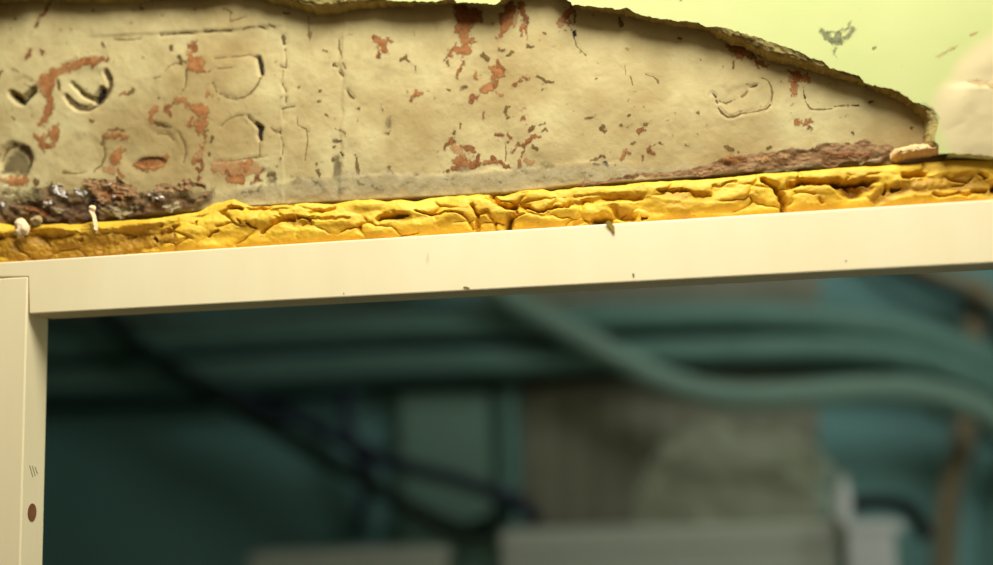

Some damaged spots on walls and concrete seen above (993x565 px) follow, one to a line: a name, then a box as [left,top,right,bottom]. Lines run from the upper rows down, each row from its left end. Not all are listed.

crack [114,8,312,162]
crack [332,40,354,99]
spalling [0,0,949,226]
crack [713,78,773,117]